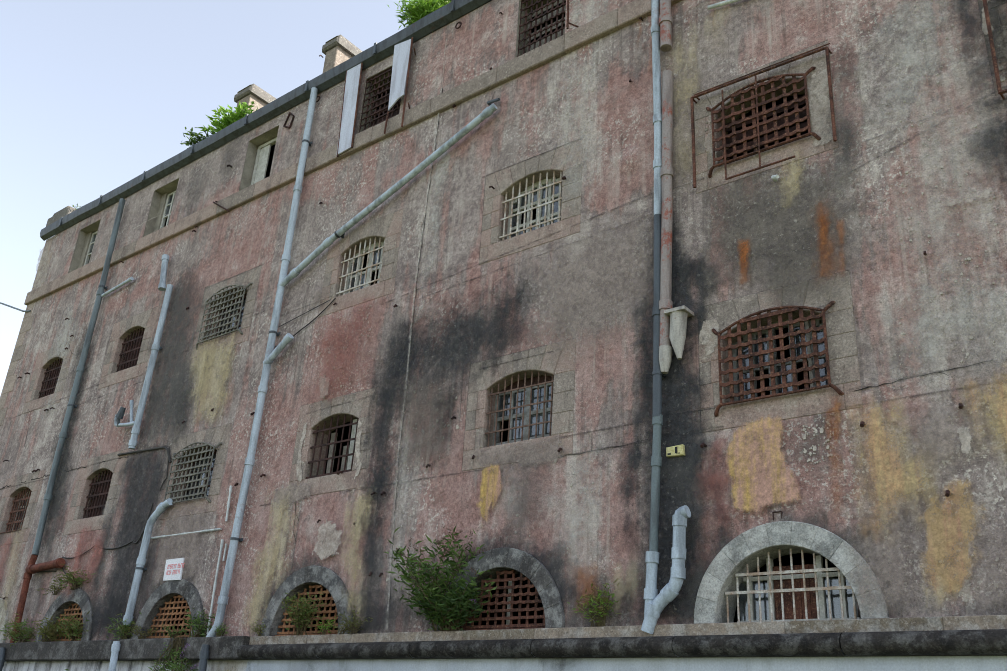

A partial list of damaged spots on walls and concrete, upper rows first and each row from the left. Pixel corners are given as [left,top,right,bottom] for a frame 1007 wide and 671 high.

leakage [73,273,234,639]
peeling [312,520,343,560]
leakage [349,288,529,580]
leakage [545,168,848,624]
leakage [839,535,892,611]